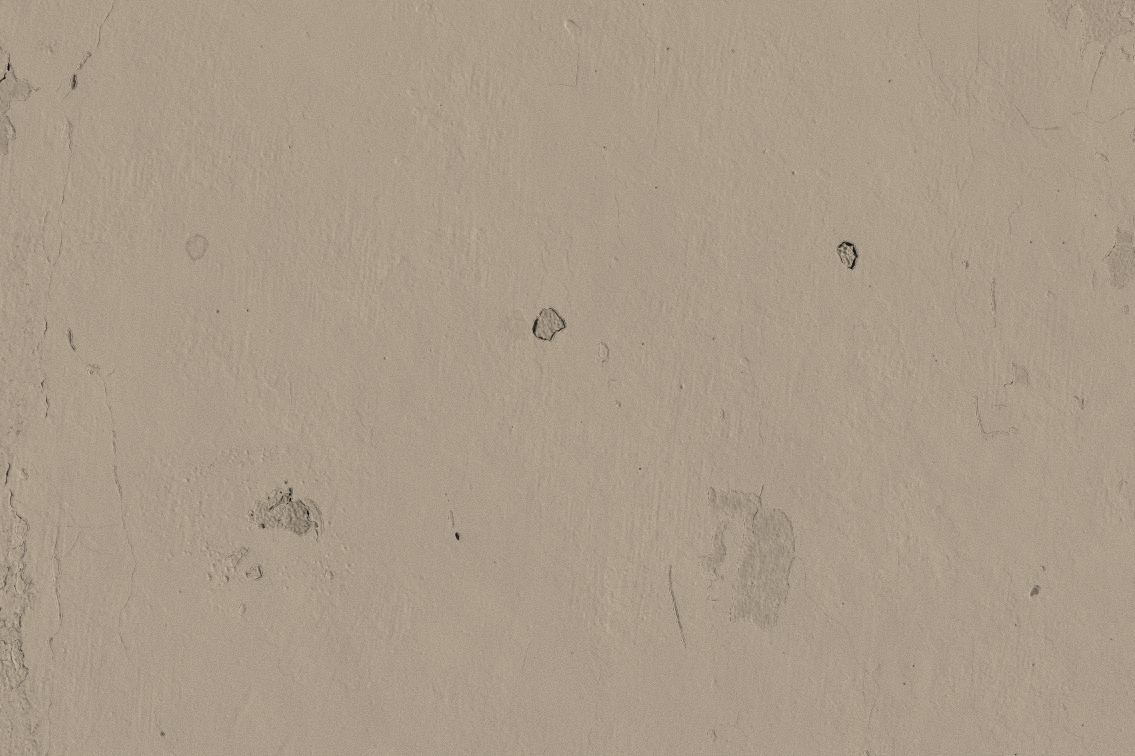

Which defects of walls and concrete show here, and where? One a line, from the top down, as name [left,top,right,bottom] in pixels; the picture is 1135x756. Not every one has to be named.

crack [0,54,11,84]
crack [31,6,113,111]
spalling [836,240,859,270]
spalling [531,307,566,342]
crack [33,140,136,647]
spalling [246,480,324,541]
peeling [698,487,796,633]